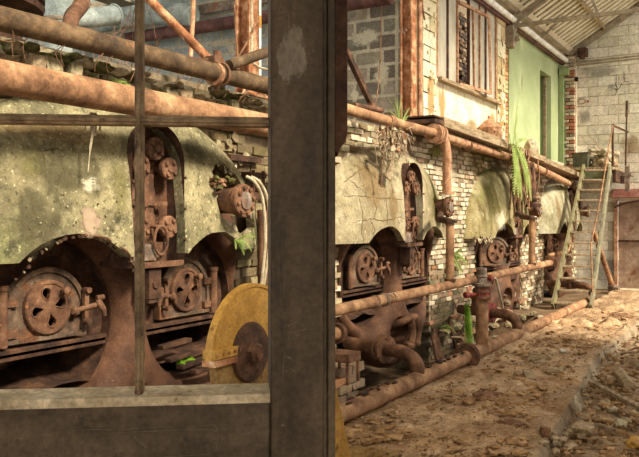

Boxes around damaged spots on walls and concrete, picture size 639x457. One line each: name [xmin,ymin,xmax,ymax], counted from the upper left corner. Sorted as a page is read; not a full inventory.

corrosion [428,79,445,117]
leakage [0,125,83,135]
leakage [39,156,100,191]
leakage [19,191,59,242]
crack [344,168,405,241]
leakage [497,183,510,228]